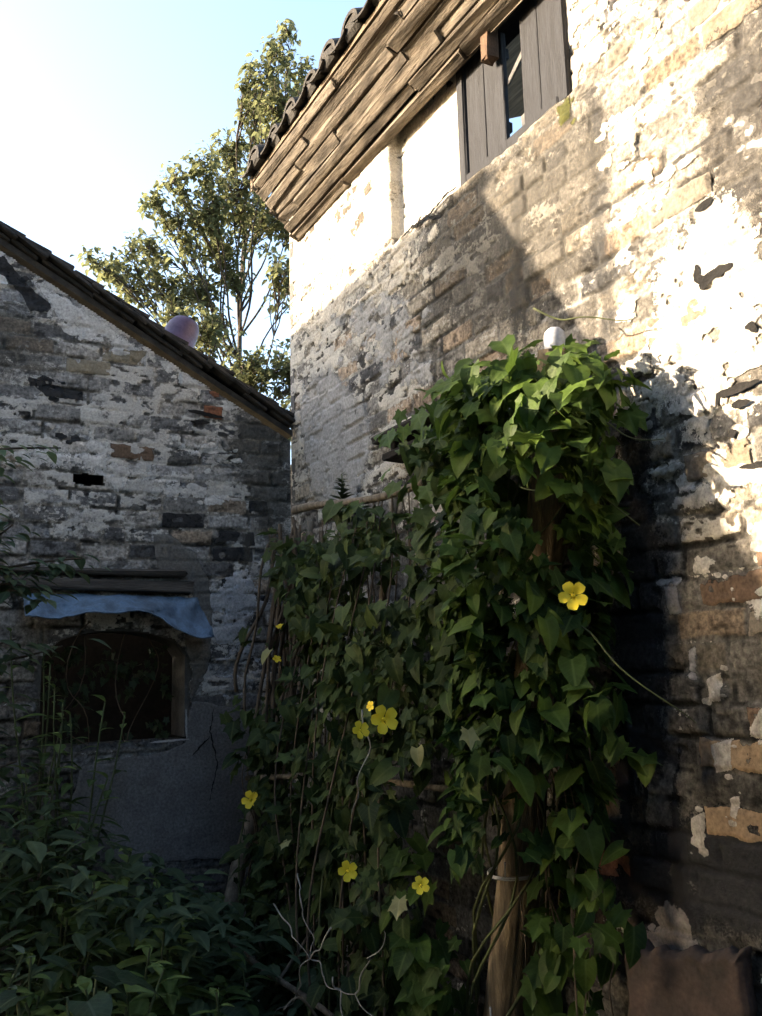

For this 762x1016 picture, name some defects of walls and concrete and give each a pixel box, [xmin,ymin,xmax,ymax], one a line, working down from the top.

peeling [0,251,239,425]
peeling [594,105,762,513]
peeling [656,576,682,614]
peeling [687,647,729,705]
crack [193,709,218,801]
flaking render [699,707,762,780]
flaking render [690,792,762,857]
spalling [646,900,699,951]